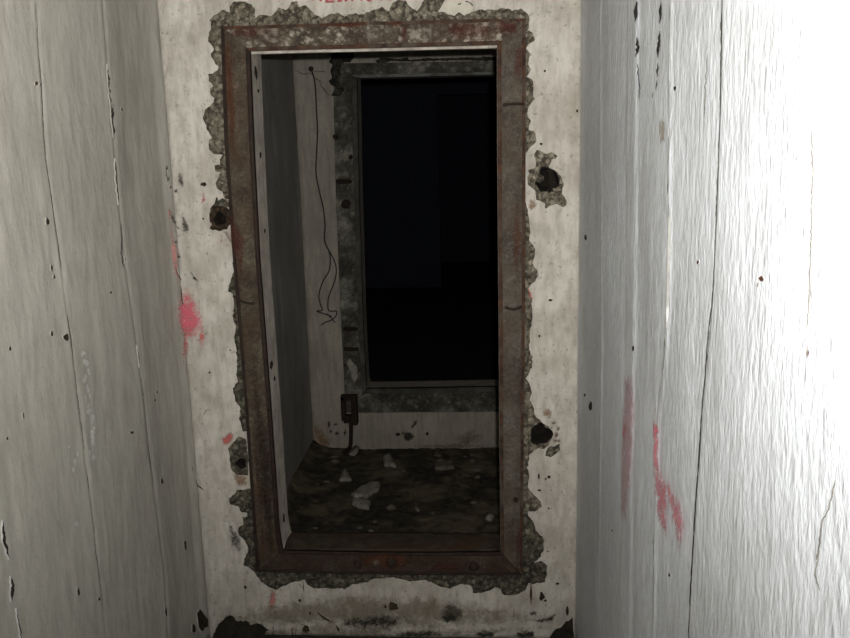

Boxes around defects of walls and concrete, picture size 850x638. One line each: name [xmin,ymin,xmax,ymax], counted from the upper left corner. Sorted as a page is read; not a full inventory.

crack [106,48,116,138]
crack [112,158,120,205]
corrosion [221,226,244,272]
spalling [200,0,567,231]
crack [136,345,154,483]
spalling [228,202,560,602]